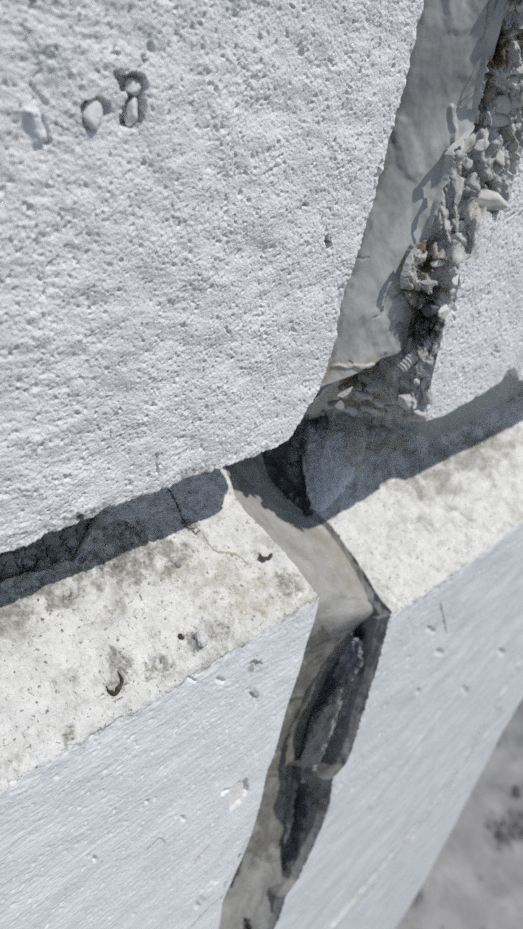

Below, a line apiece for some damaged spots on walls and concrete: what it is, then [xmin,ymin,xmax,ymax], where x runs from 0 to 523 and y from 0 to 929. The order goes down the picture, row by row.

spalling [80,70,147,131]
spalling [261,0,523,517]
crack [0,511,109,577]